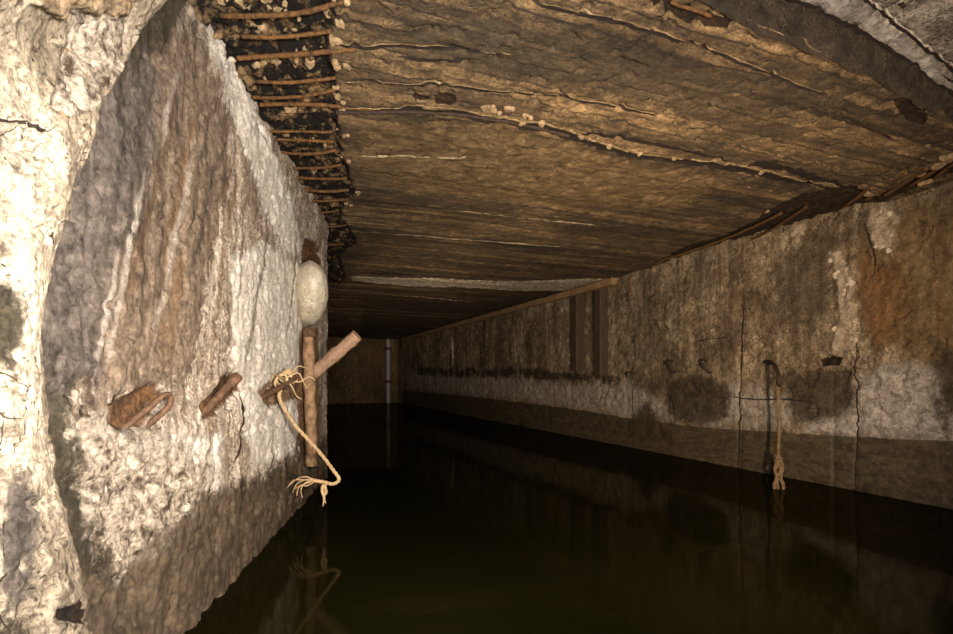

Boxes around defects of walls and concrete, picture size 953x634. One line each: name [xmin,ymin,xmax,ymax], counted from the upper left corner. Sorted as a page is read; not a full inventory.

water stain [0,284,25,365]
crack [0,118,59,136]
corrosion [64,10,243,439]
water stain [41,0,328,634]
spalling [197,0,619,291]
crack [327,36,846,189]
crack [532,0,895,141]
corrosion [859,202,953,361]
water stain [403,334,953,509]
water stain [0,469,40,634]